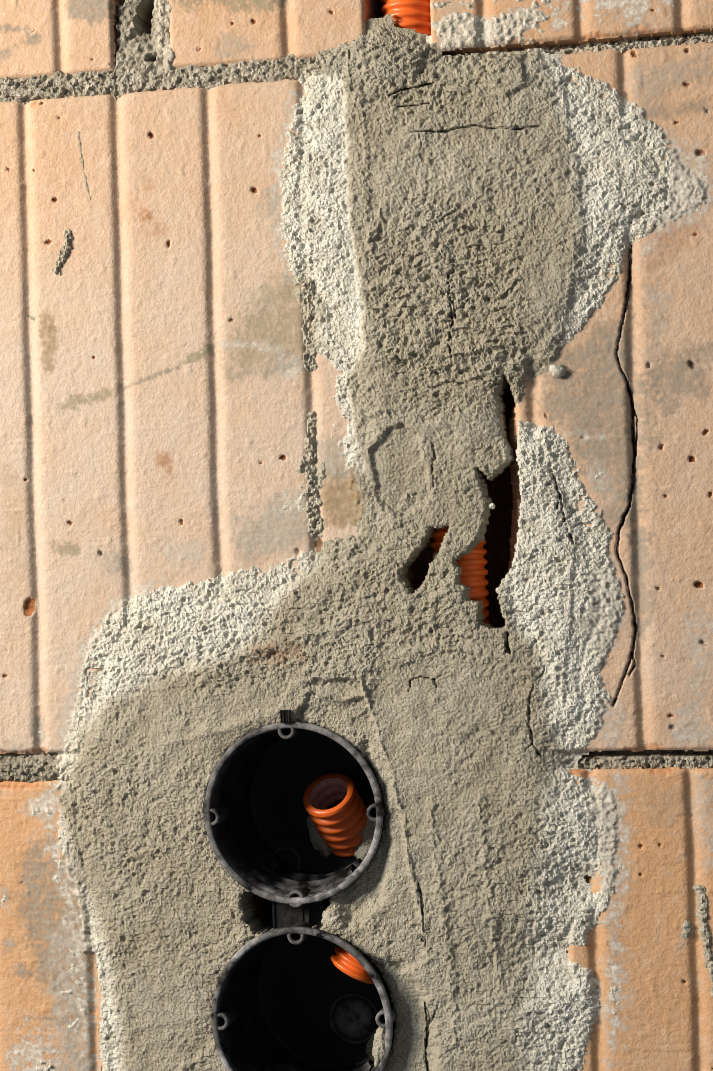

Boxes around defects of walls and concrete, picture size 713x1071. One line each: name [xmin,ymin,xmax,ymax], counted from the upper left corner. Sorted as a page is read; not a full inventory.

crack [388,82,538,133]
hole [452,375,519,629]
crack [613,245,637,704]
flaking render [400,526,446,594]
crack [424,1001,434,1071]